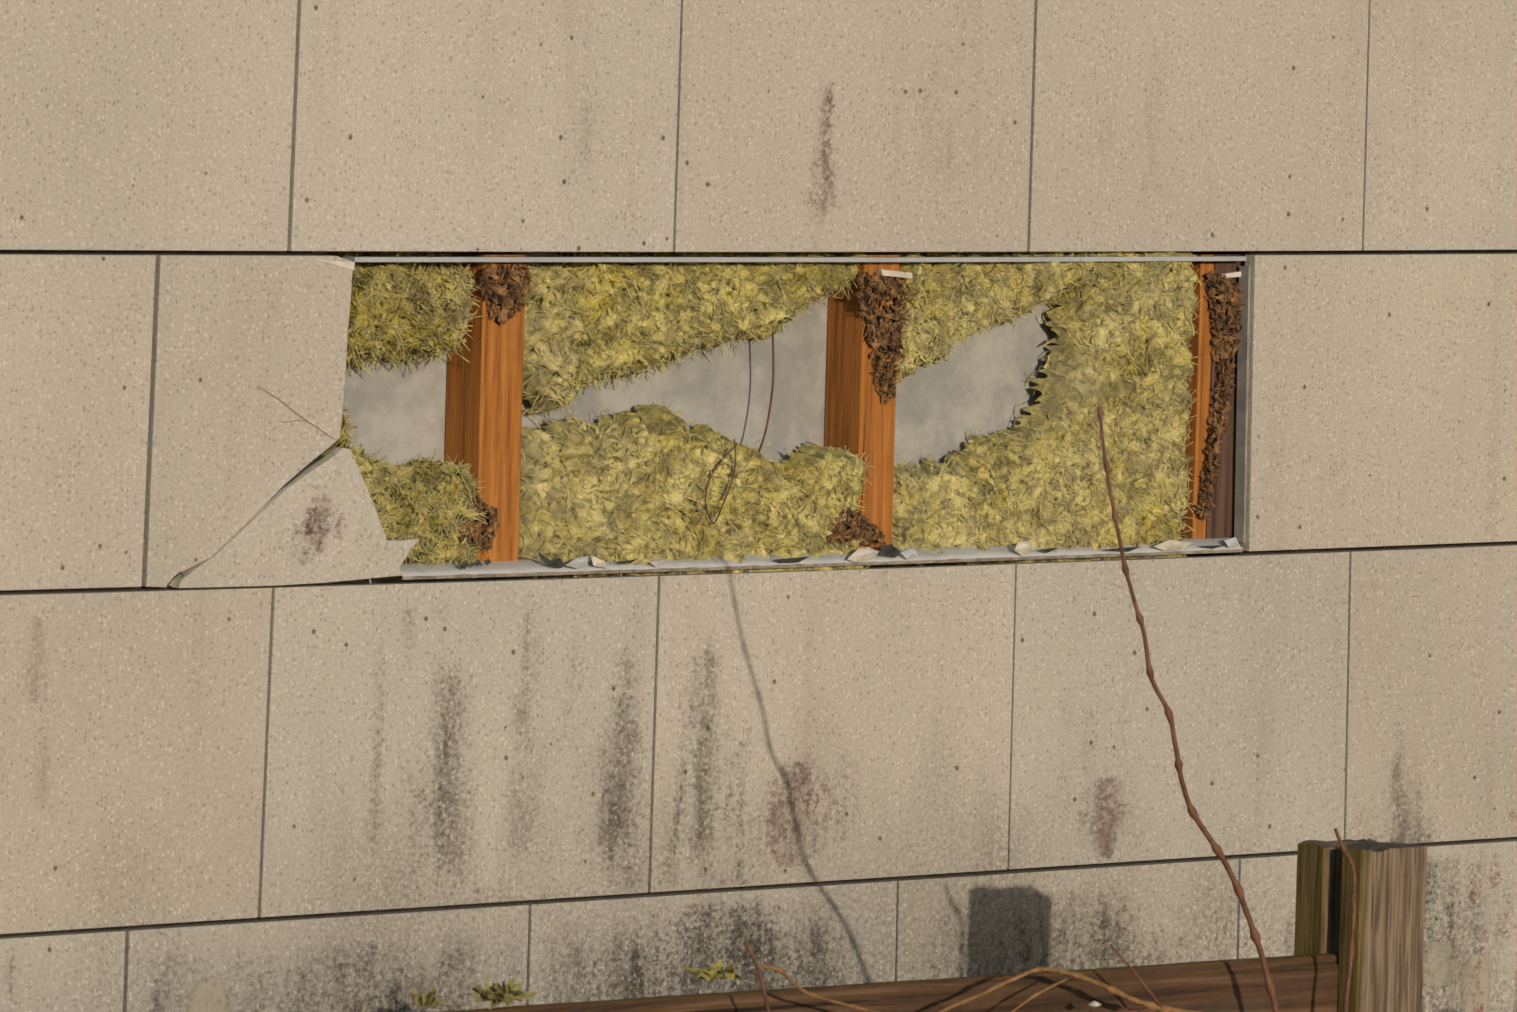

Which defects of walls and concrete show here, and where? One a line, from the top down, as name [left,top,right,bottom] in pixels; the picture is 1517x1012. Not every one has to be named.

crack [258,386,338,489]
water stain [435,725,457,834]
water stain [603,732,628,851]
water stain [738,911,775,991]
water stain [1423,941,1491,1012]